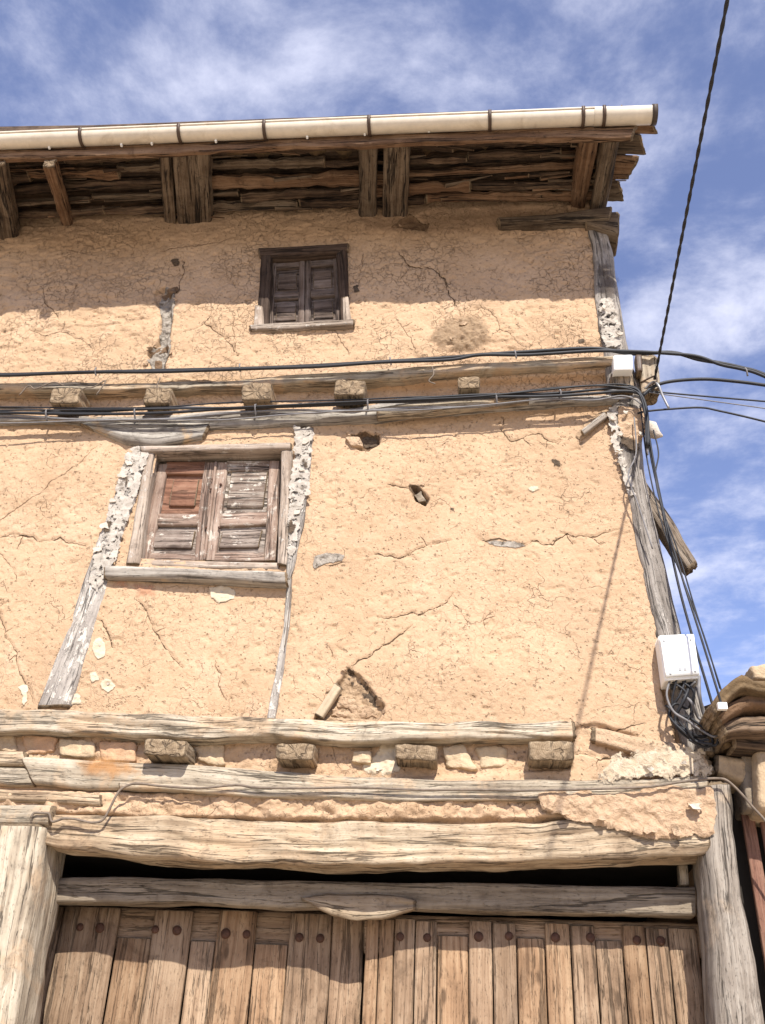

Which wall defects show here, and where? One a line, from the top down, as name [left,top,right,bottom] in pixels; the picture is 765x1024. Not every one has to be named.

flaking render [143,287,179,369]
crack [399,254,526,347]
flaking render [345,431,380,452]
flaking render [409,483,429,506]
crack [529,532,608,545]
crack [326,595,494,668]
flaking render [315,669,386,721]
flaking render [538,745,717,839]